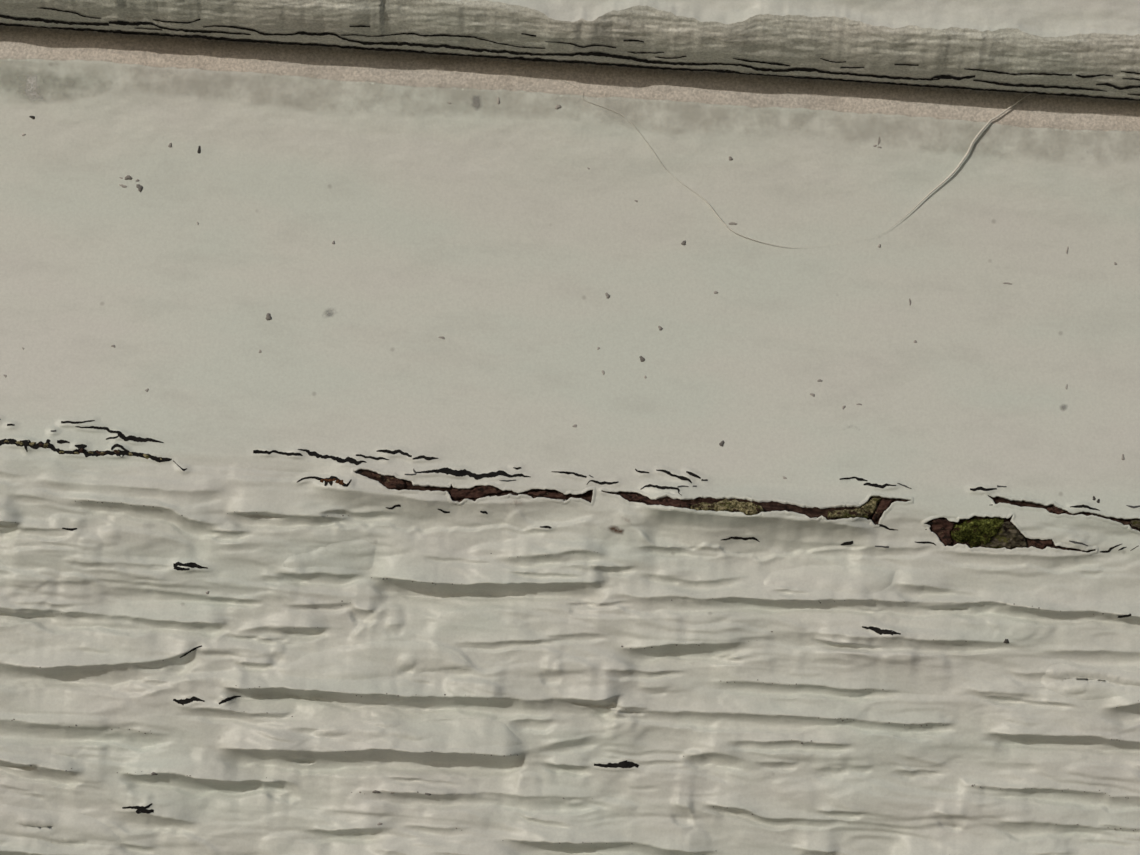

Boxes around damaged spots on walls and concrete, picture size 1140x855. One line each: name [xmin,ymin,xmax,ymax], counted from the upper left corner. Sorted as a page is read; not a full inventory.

crack [0,8,1140,96]
peeling [351,465,914,530]
peeling [921,492,1140,556]